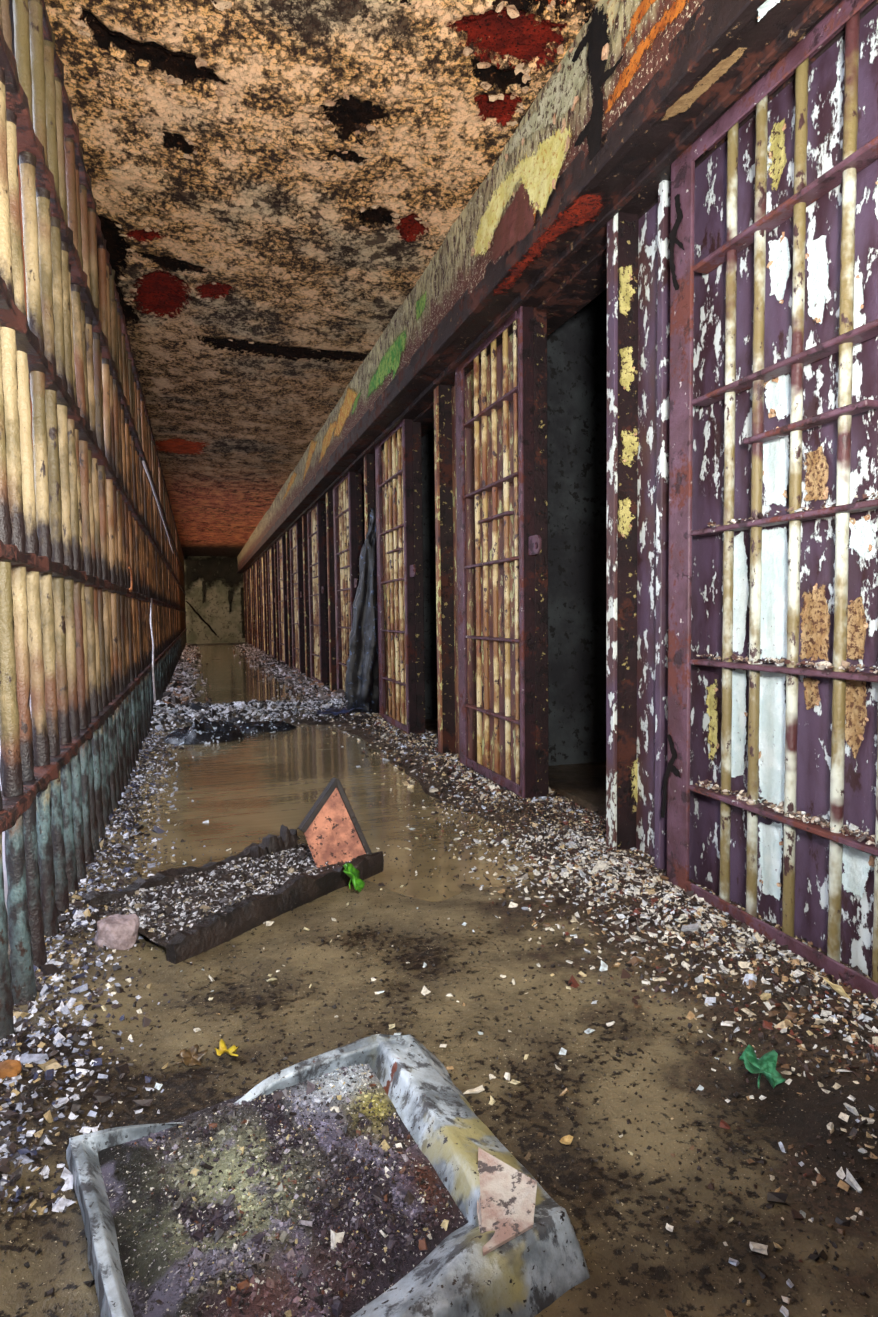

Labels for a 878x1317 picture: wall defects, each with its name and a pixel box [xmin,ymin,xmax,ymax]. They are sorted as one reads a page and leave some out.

flaking render [70,1,228,96]
flaking render [157,131,200,159]
flaking render [319,92,392,166]
flaking render [440,0,623,262]
flaking render [353,204,430,242]
flaking render [98,215,234,326]
peeling [621,428,639,467]
peeling [763,374,829,506]
peeling [618,498,635,538]
peeling [849,514,875,558]
peeling [706,527,831,900]
peeling [842,845,875,898]